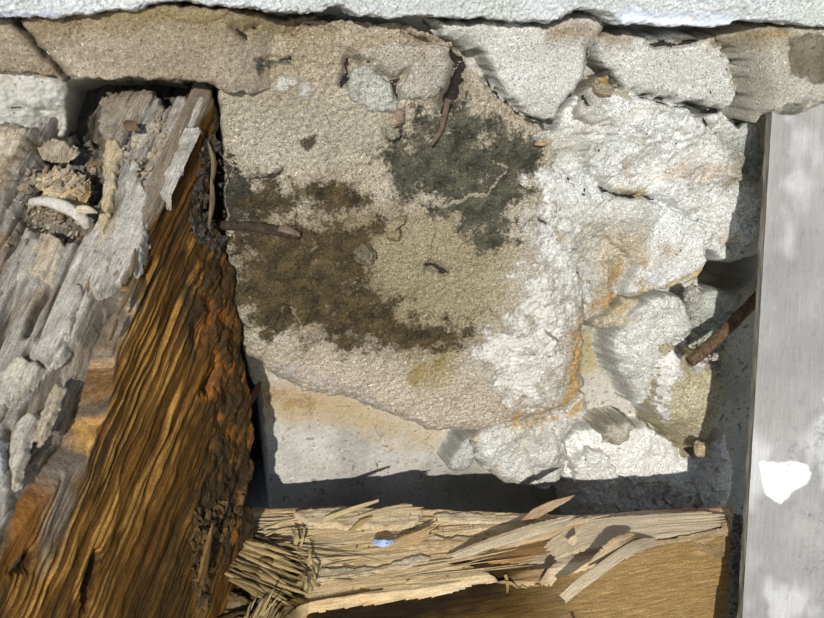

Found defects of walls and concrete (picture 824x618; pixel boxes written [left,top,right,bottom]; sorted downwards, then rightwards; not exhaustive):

crack [235,26,256,40]
crack [649,39,697,47]
crack [340,57,370,88]
crack [390,77,400,99]
crack [408,32,467,115]
crack [249,168,283,180]
spalling [533,92,764,320]
water stain [215,87,592,421]
peeling [436,429,477,471]